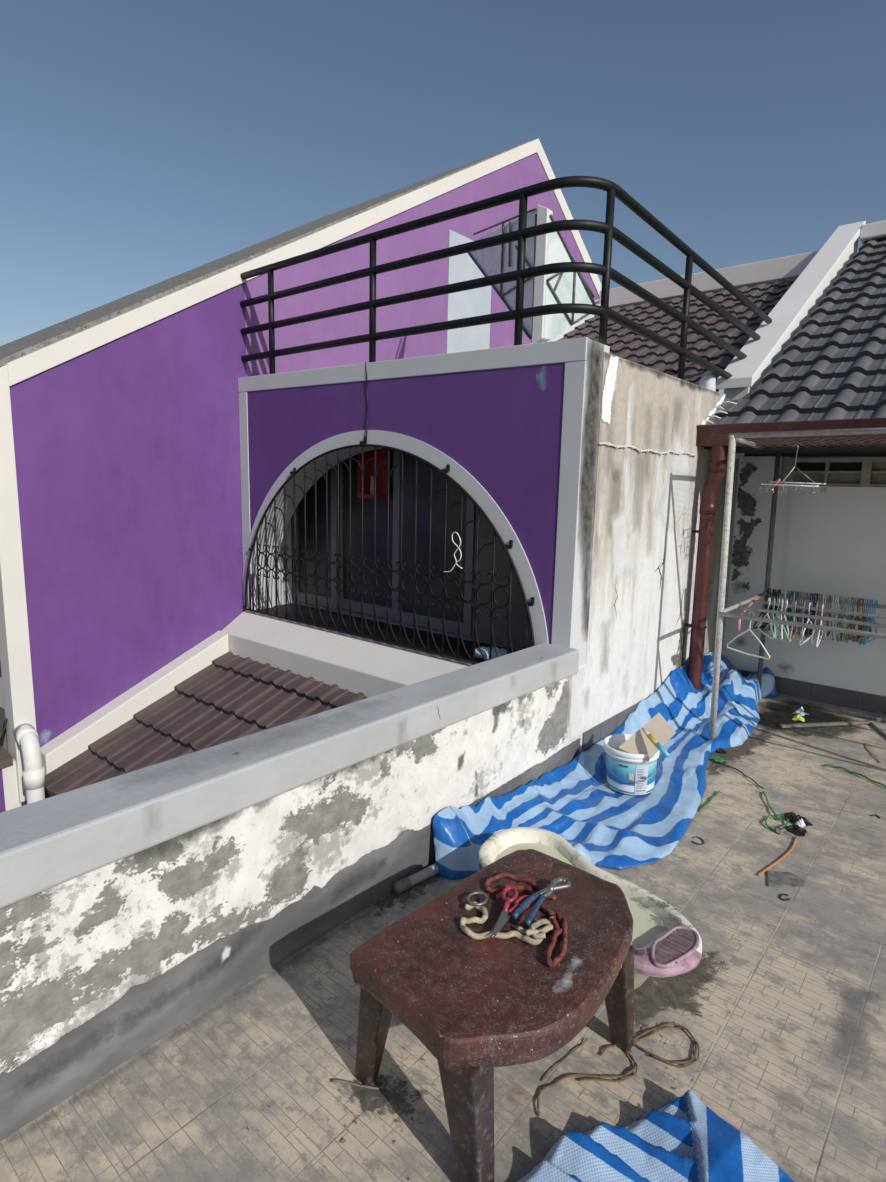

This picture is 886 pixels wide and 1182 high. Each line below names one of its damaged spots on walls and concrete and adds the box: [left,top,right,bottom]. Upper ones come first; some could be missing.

leakage [580,339,613,636]
leakage [613,386,634,581]
crack [656,541,685,650]
peeling [377,728,445,778]
peeling [493,675,573,756]
peeling [0,772,372,1073]